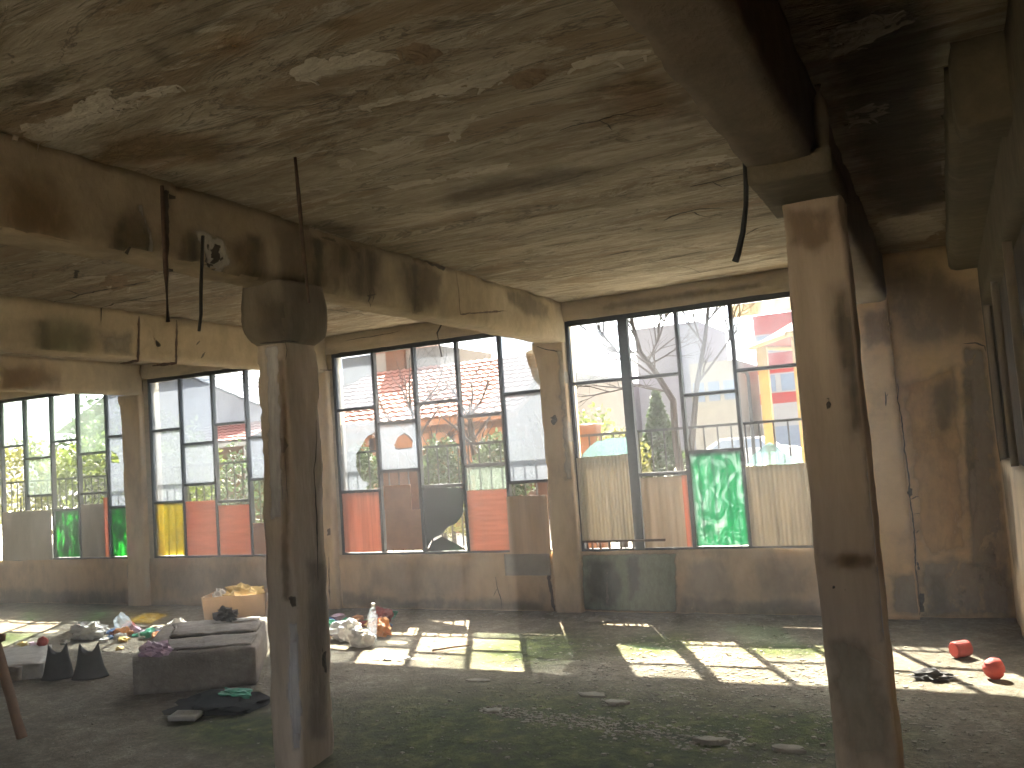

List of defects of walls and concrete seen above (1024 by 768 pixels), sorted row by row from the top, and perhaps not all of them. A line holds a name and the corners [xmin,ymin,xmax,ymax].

peeling [12,84,186,152]
peeling [289,42,444,86]
crack [885,384,925,612]
damp [894,349,1016,615]